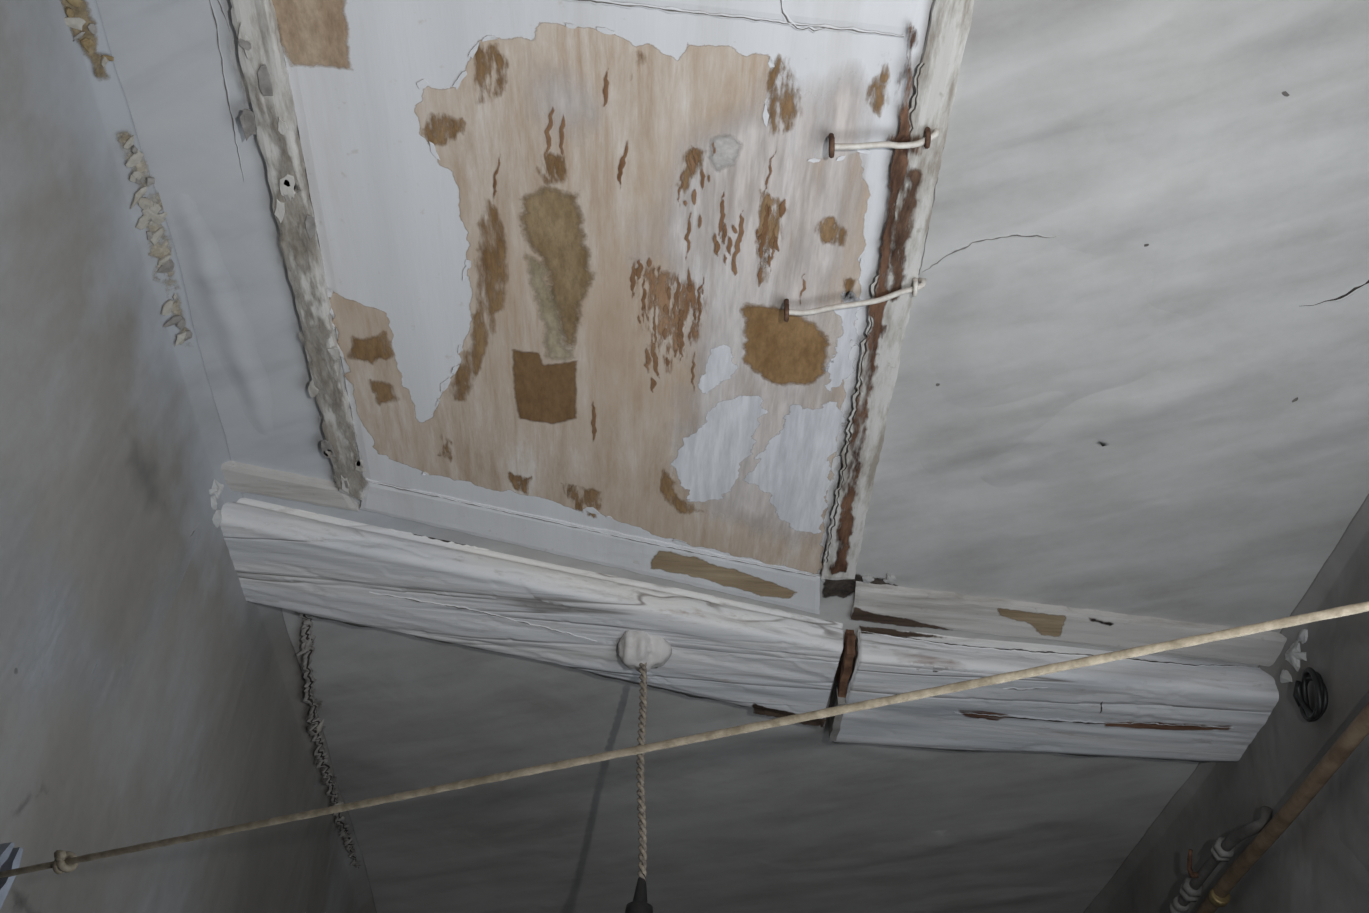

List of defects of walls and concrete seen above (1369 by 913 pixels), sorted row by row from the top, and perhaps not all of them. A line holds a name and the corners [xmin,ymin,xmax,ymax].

flaking render [61,0,114,79]
flaking render [118,132,192,346]
peeling [327,23,897,599]
corrosion [830,24,922,575]
crack [1299,276,1369,307]
peeling [998,608,1066,637]